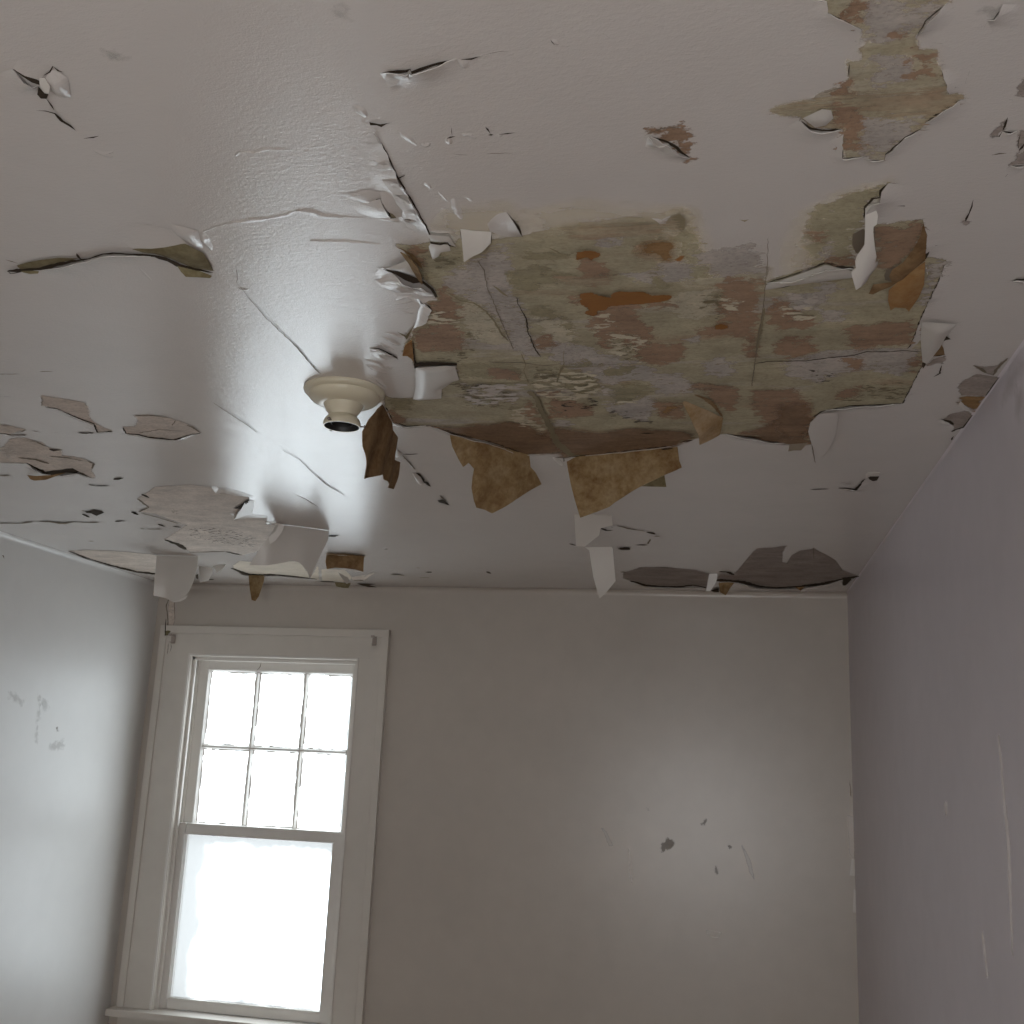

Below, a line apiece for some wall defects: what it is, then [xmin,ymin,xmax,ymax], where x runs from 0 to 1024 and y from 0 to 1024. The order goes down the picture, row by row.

peeling [771,0,972,166]
peeling [641,121,697,164]
peeling [7,223,214,281]
crack [236,269,321,374]
peeling [0,424,96,481]
peeling [41,396,204,442]
peeling [362,182,957,598]
peeling [934,358,1008,440]
peeling [69,485,375,602]